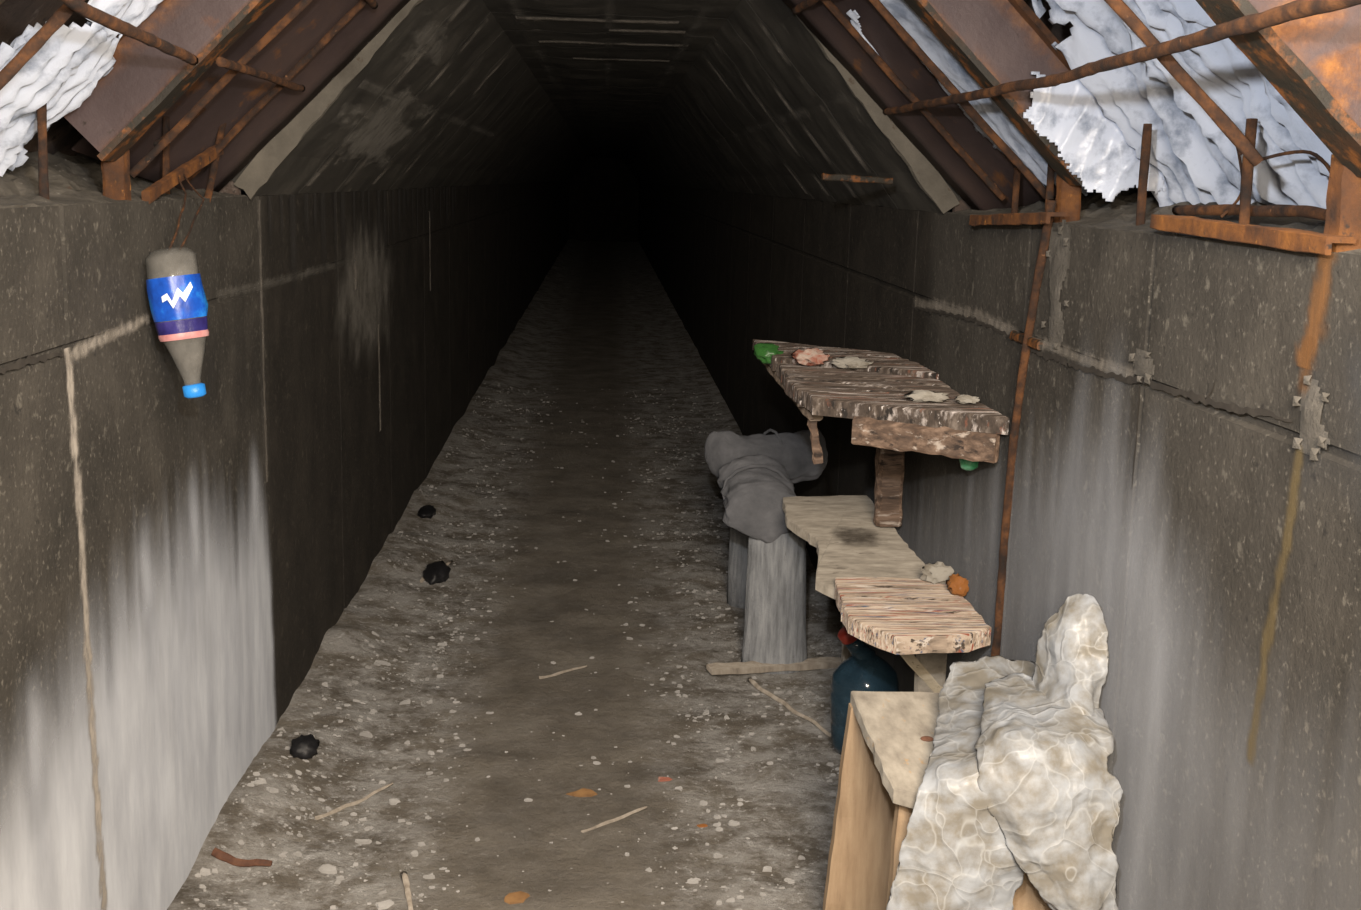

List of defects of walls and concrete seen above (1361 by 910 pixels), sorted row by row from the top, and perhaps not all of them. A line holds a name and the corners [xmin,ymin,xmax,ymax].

leakage [0,317,276,910]
corrosion [1260,453,1301,691]